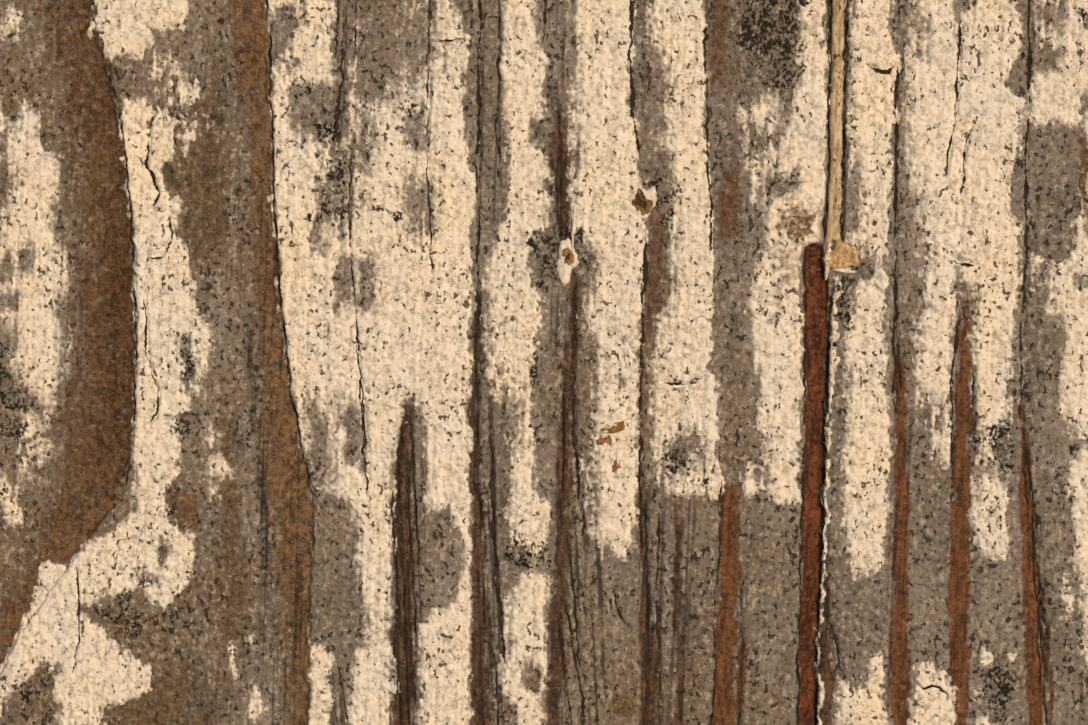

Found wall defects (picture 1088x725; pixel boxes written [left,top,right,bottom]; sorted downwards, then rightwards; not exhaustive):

crack [627,0,641,158]
leakage [711,0,818,101]
leakage [0,0,136,665]
crack [426,0,506,725]
peeling [265,0,726,725]
crack [614,238,702,725]
peeling [739,229,807,506]
corrosion [797,243,829,725]
leakage [818,553,836,725]
corrosion [889,359,912,725]
peeling [814,0,1088,725]
corrosion [948,311,974,725]